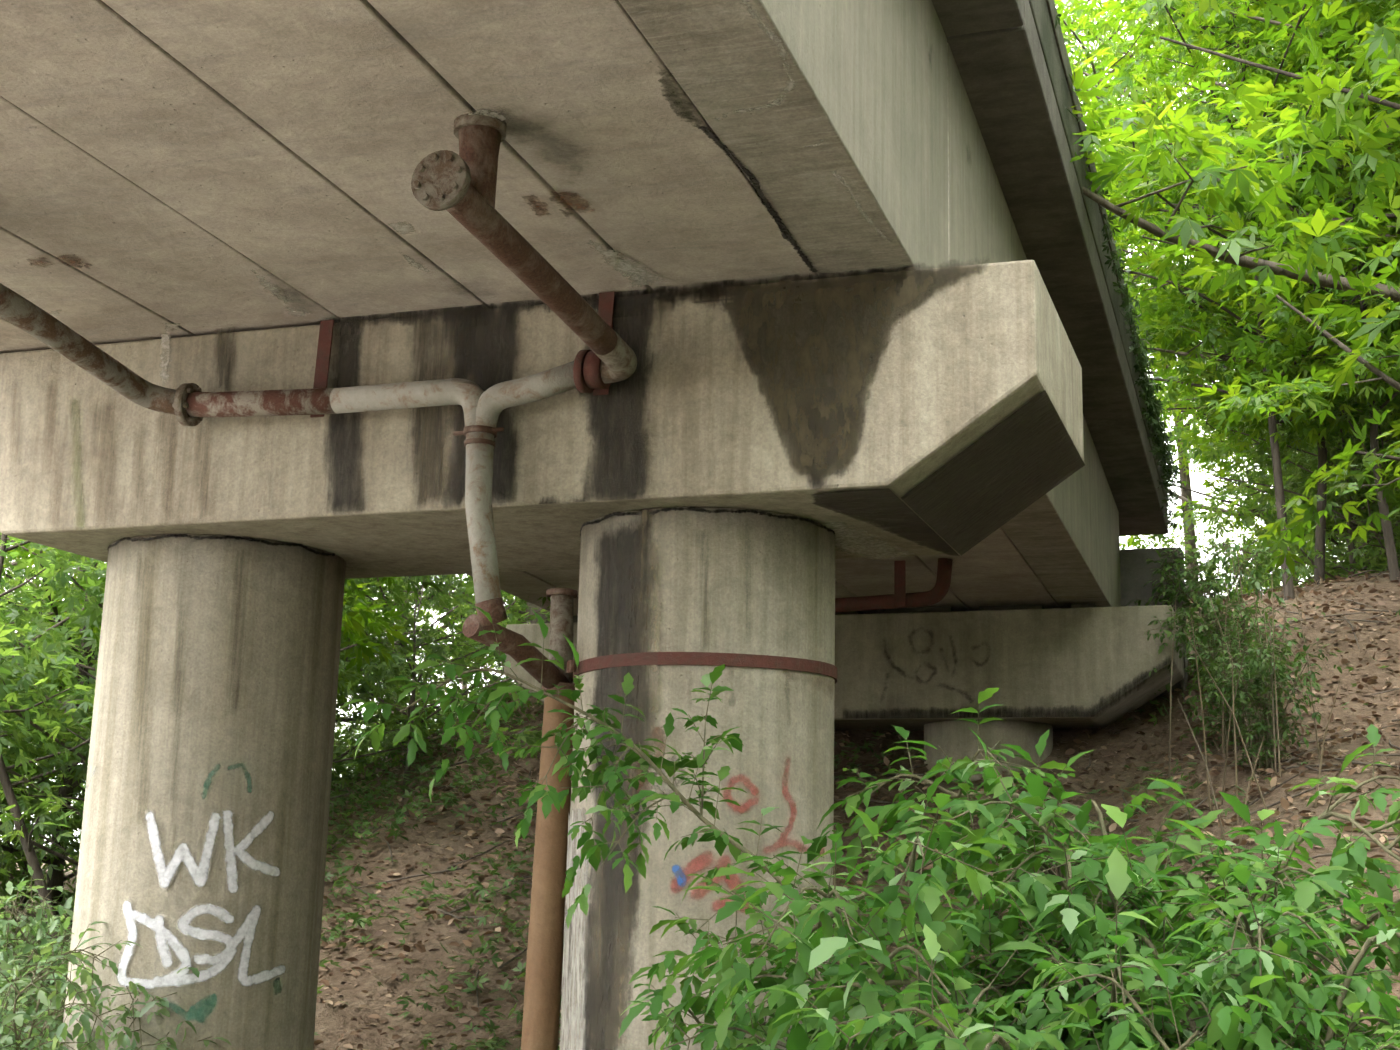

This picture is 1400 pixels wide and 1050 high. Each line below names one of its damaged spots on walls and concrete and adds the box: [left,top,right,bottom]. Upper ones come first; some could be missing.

rust [528,192,594,216]
crack [698,126,818,272]
leakage [333,302,550,392]
leakage [325,412,364,513]
leakage [412,405,466,504]
leakage [492,409,517,500]
leakage [559,241,1085,1050]